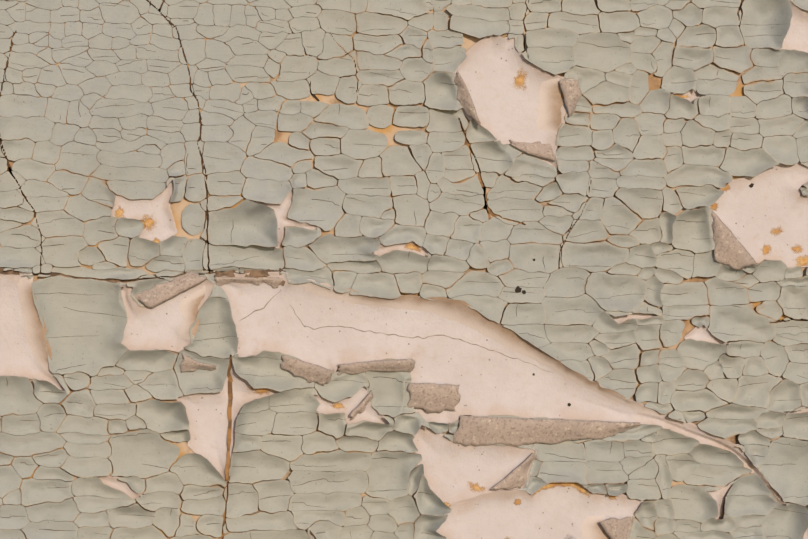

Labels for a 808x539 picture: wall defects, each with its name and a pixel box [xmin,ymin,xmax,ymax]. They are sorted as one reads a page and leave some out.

peeling [0,239,371,539]
peeling [0,0,435,280]
crack [218,354,233,539]
crack [0,0,549,372]
peeling [423,0,529,110]
peeling [167,82,808,539]
crack [558,182,591,267]
peeling [376,27,808,350]
peeling [524,0,808,131]
crack [770,316,808,324]